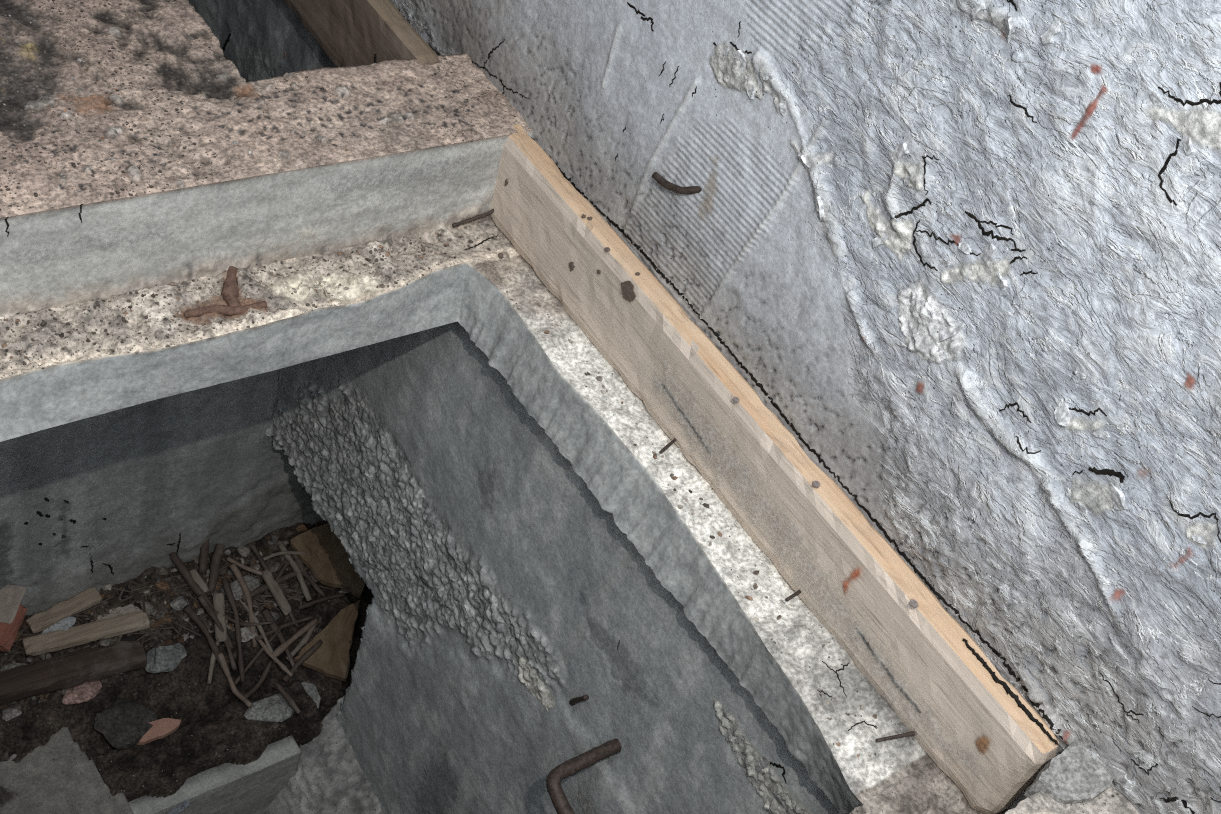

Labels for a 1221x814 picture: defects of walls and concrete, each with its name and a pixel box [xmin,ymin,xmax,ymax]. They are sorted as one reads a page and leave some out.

crack [627,2,654,31]
crack [471,39,530,99]
crack [659,61,697,97]
crack [713,21,764,98]
crack [1008,95,1037,123]
crack [1158,82,1221,106]
crack [1158,138,1181,206]
crack [1068,407,1107,416]
crack [531,137,1063,740]
crack [1072,467,1125,483]
crack [1169,500,1221,542]
spalling [0,321,839,814]